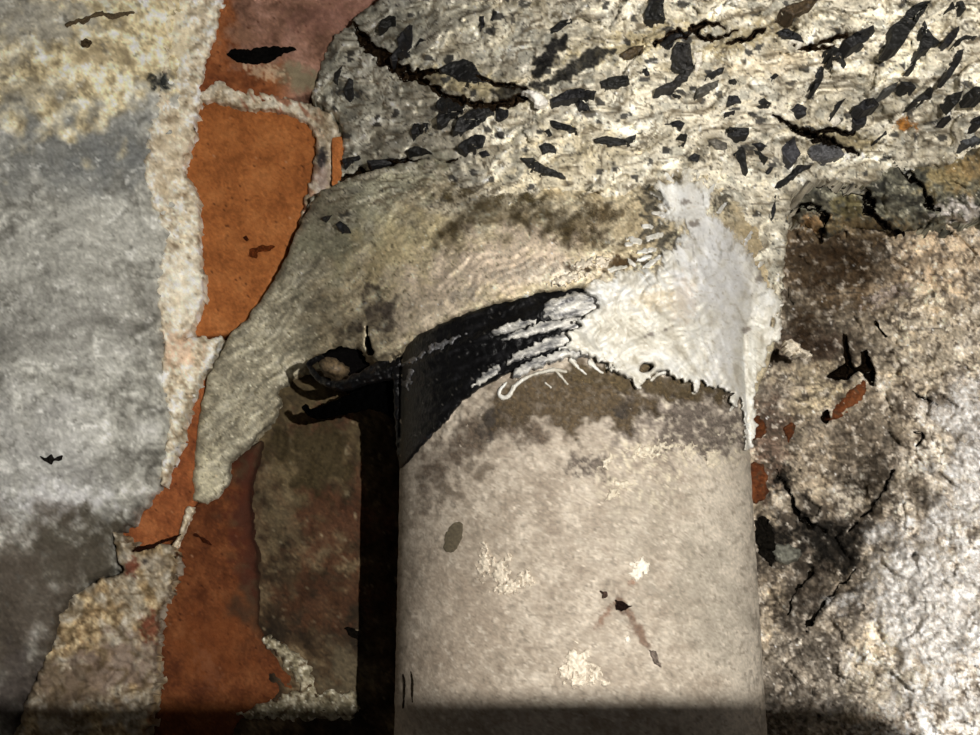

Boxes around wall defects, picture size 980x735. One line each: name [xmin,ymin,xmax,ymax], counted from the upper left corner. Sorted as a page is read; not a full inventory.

spalling [333,65,354,102]
crack [351,20,528,112]
crack [772,114,860,157]
spalling [321,215,351,234]
spalling [243,236,275,258]
crack [776,469,895,534]
crack [787,566,856,633]